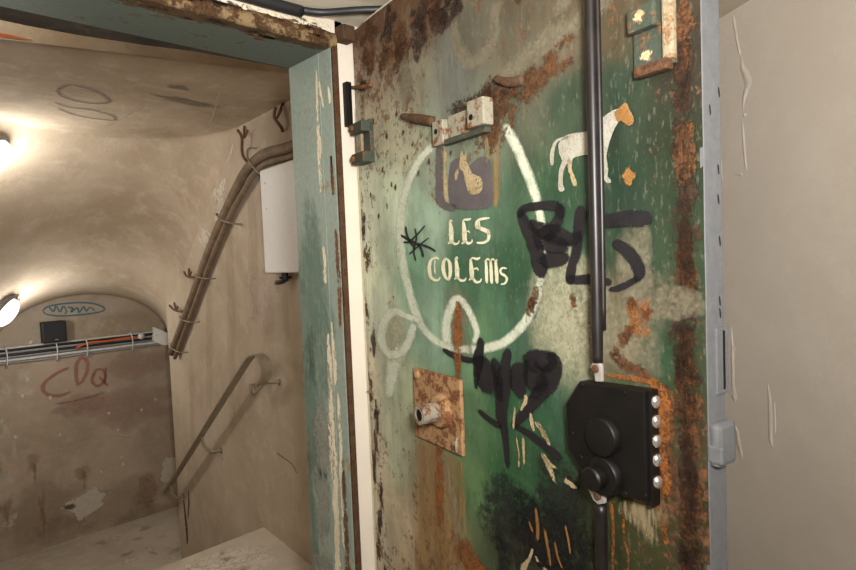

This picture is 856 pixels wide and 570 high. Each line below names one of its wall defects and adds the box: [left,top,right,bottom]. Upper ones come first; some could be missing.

corrosion [118,0,327,50]
corrosion [359,0,463,92]
corrosion [447,33,574,155]
corrosion [453,301,463,379]
corrosion [526,286,539,316]
corrosion [604,0,704,570]
flaking render [61,486,106,521]
corrosion [435,445,488,570]